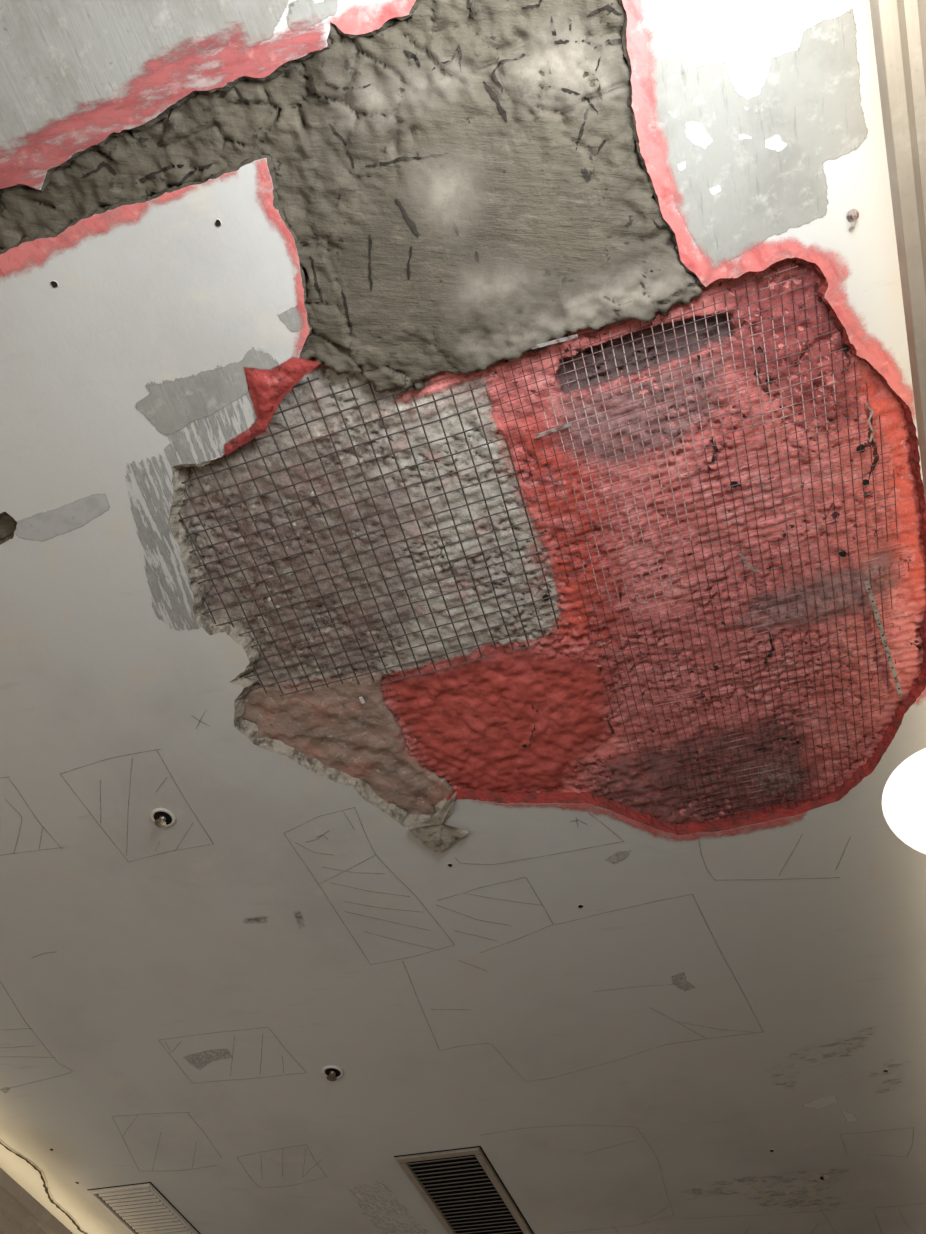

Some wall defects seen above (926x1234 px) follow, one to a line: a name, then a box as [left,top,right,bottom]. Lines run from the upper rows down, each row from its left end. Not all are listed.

flaking render [0,0,926,852]
crack [0,1140,89,1234]